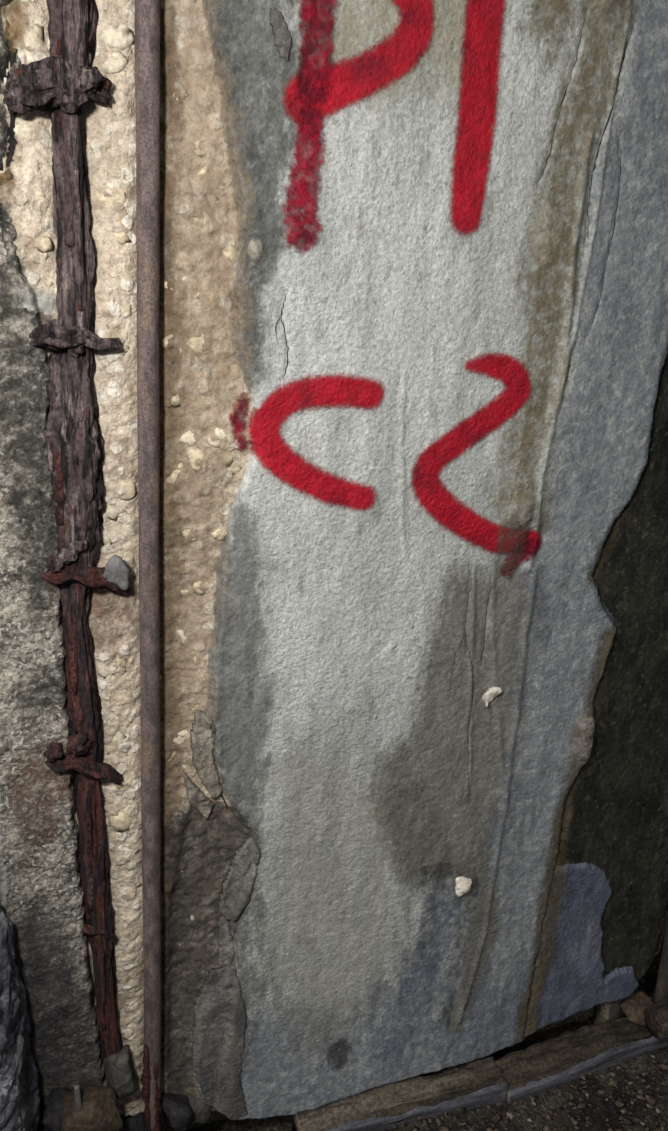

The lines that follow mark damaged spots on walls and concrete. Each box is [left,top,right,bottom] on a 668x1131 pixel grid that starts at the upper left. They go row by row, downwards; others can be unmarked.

crack [0,8,32,185]
spalling [0,0,58,324]
rust [46,0,75,57]
rust [60,118,87,311]
rust [49,425,91,525]
rust [89,573,134,615]
spalling [81,0,145,1116]
spalling [159,0,261,1121]
leakage [161,0,668,1120]
spalling [71,770,80,859]